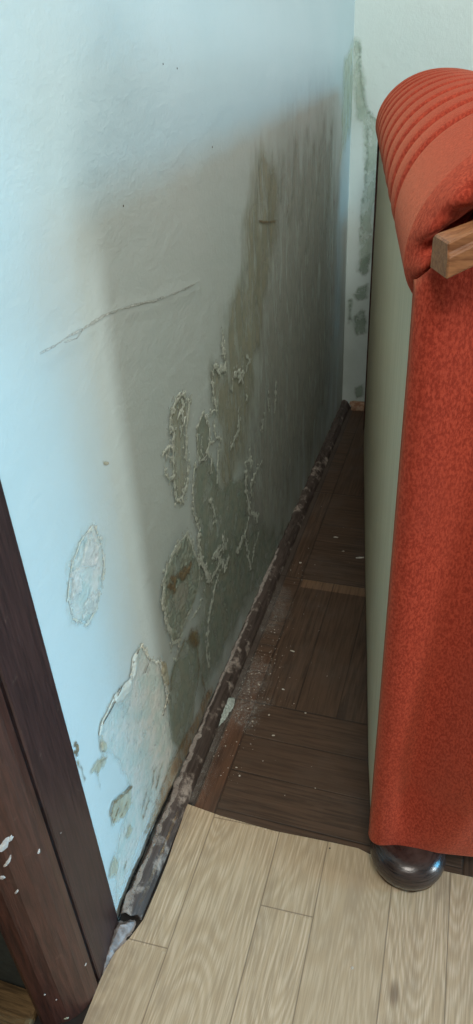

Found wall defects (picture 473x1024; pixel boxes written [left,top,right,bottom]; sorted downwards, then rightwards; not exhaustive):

damp [343,43,377,334]
damp [162,156,278,746]
peeling [92,548,279,909]